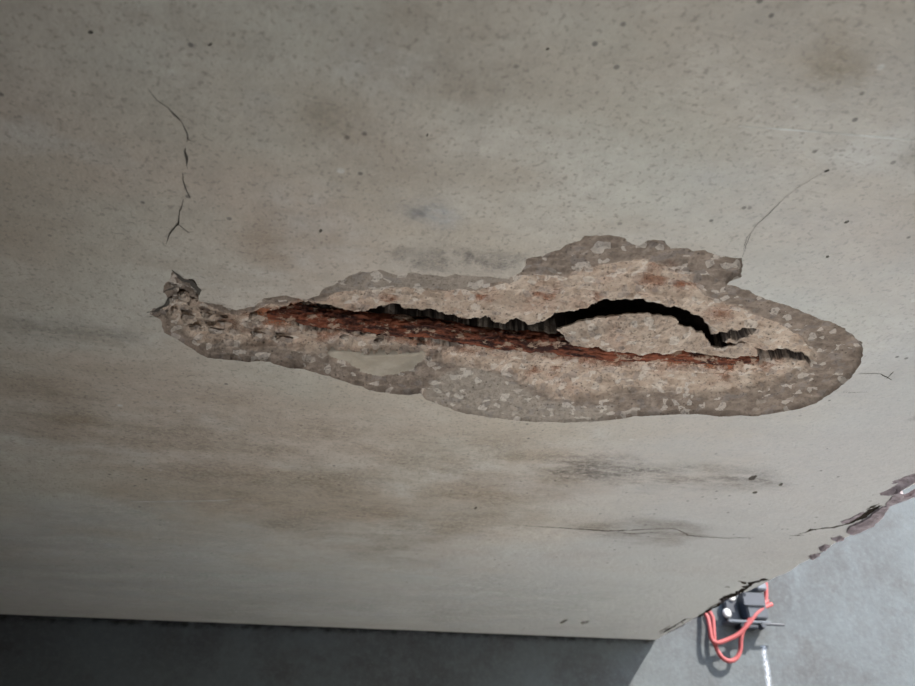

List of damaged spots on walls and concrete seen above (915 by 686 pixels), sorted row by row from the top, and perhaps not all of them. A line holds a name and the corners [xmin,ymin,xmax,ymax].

crack [149,90,193,243]
spalling [147,235,863,423]
crack [520,525,719,538]
crack [794,504,887,536]
spalling [880,473,915,512]
crack [659,578,768,633]